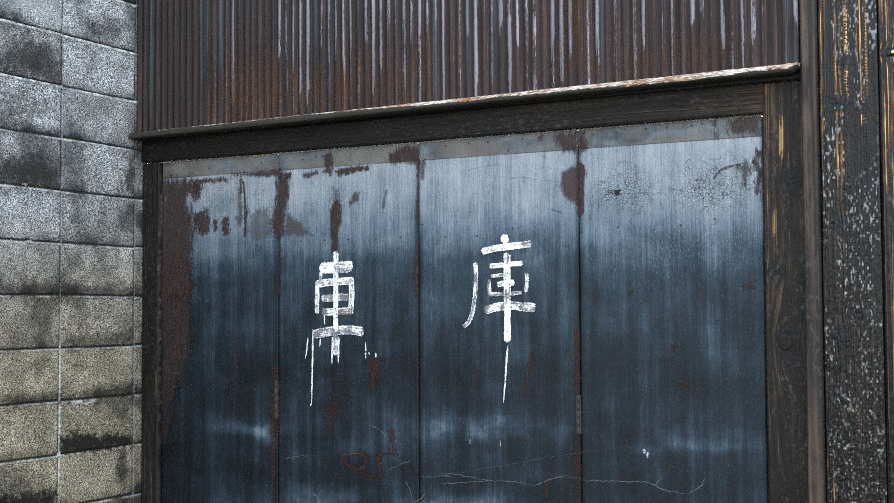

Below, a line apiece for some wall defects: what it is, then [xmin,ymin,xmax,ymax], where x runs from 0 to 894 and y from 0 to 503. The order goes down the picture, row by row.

damp [0,32,62,86]
damp [0,153,58,189]
damp [126,161,135,194]
corrosion [302,152,370,178]
corrosion [555,130,588,216]
corrosion [330,192,360,253]
corrosion [161,169,307,399]
damp [5,393,57,406]
damp [69,383,134,400]
damp [58,428,134,481]
damp [0,486,57,503]